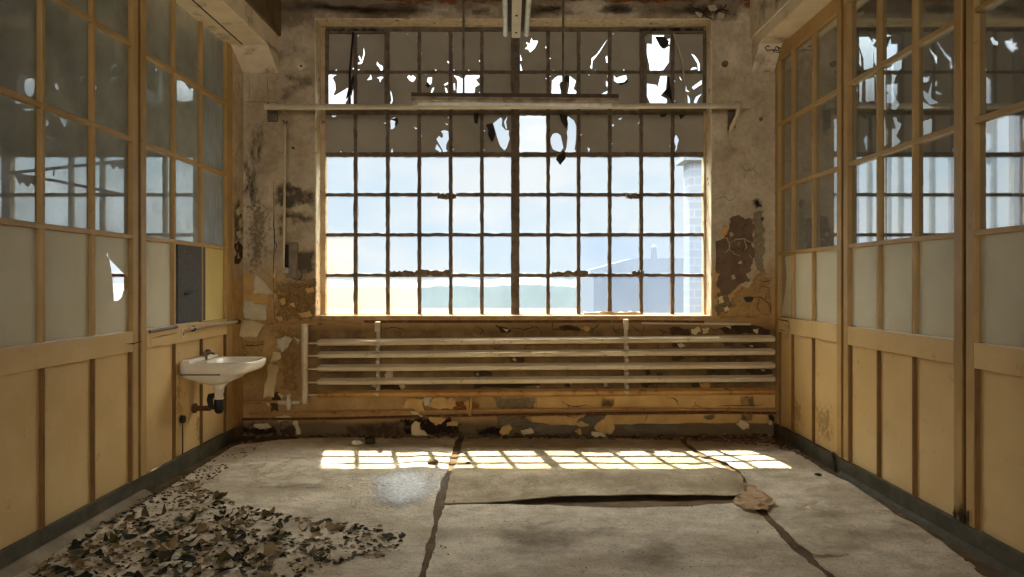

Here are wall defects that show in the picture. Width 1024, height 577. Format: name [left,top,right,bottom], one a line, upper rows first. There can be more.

water stain [277,183,313,235]
water stain [298,251,315,272]
spalling [669,211,791,361]
peeling [234,203,313,436]
peeling [410,397,469,436]
peeling [473,369,775,435]